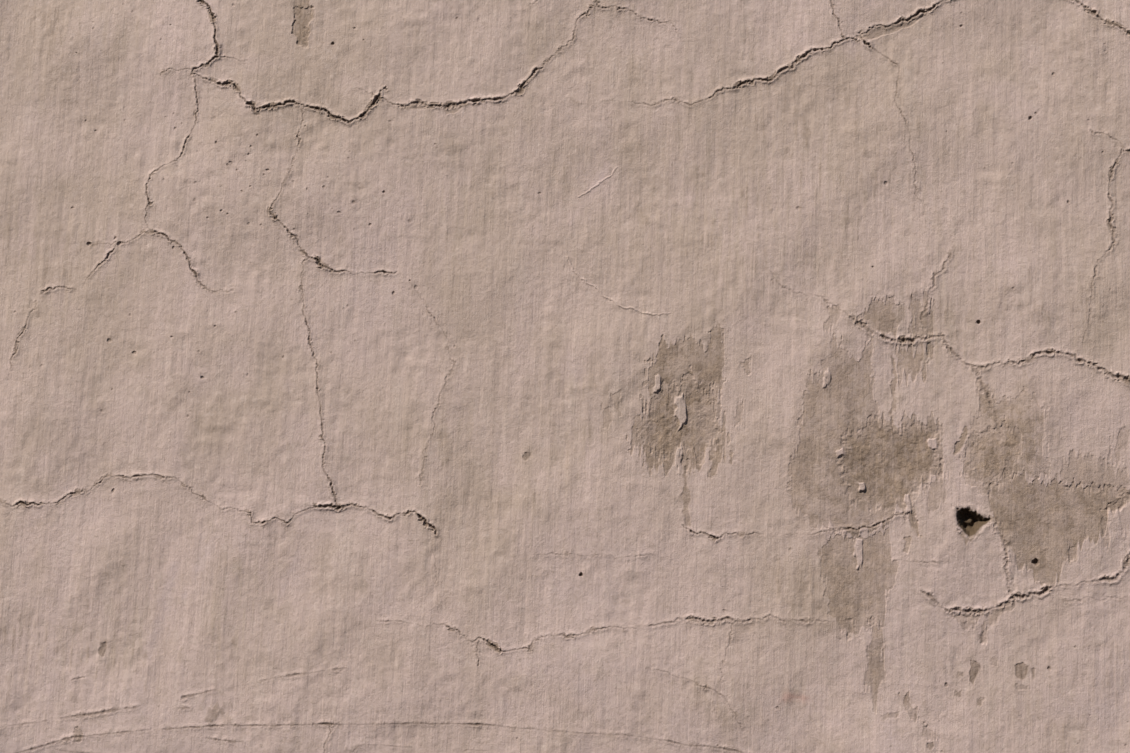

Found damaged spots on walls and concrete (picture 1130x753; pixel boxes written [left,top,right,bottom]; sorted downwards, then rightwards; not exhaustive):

crack [558,0,951,223]
crack [1069,0,1130,36]
crack [0,0,842,728]
water stain [677,333,850,643]
crack [682,511,910,542]
crack [769,129,1130,452]
peeling [797,289,1130,753]
crack [893,513,1130,615]